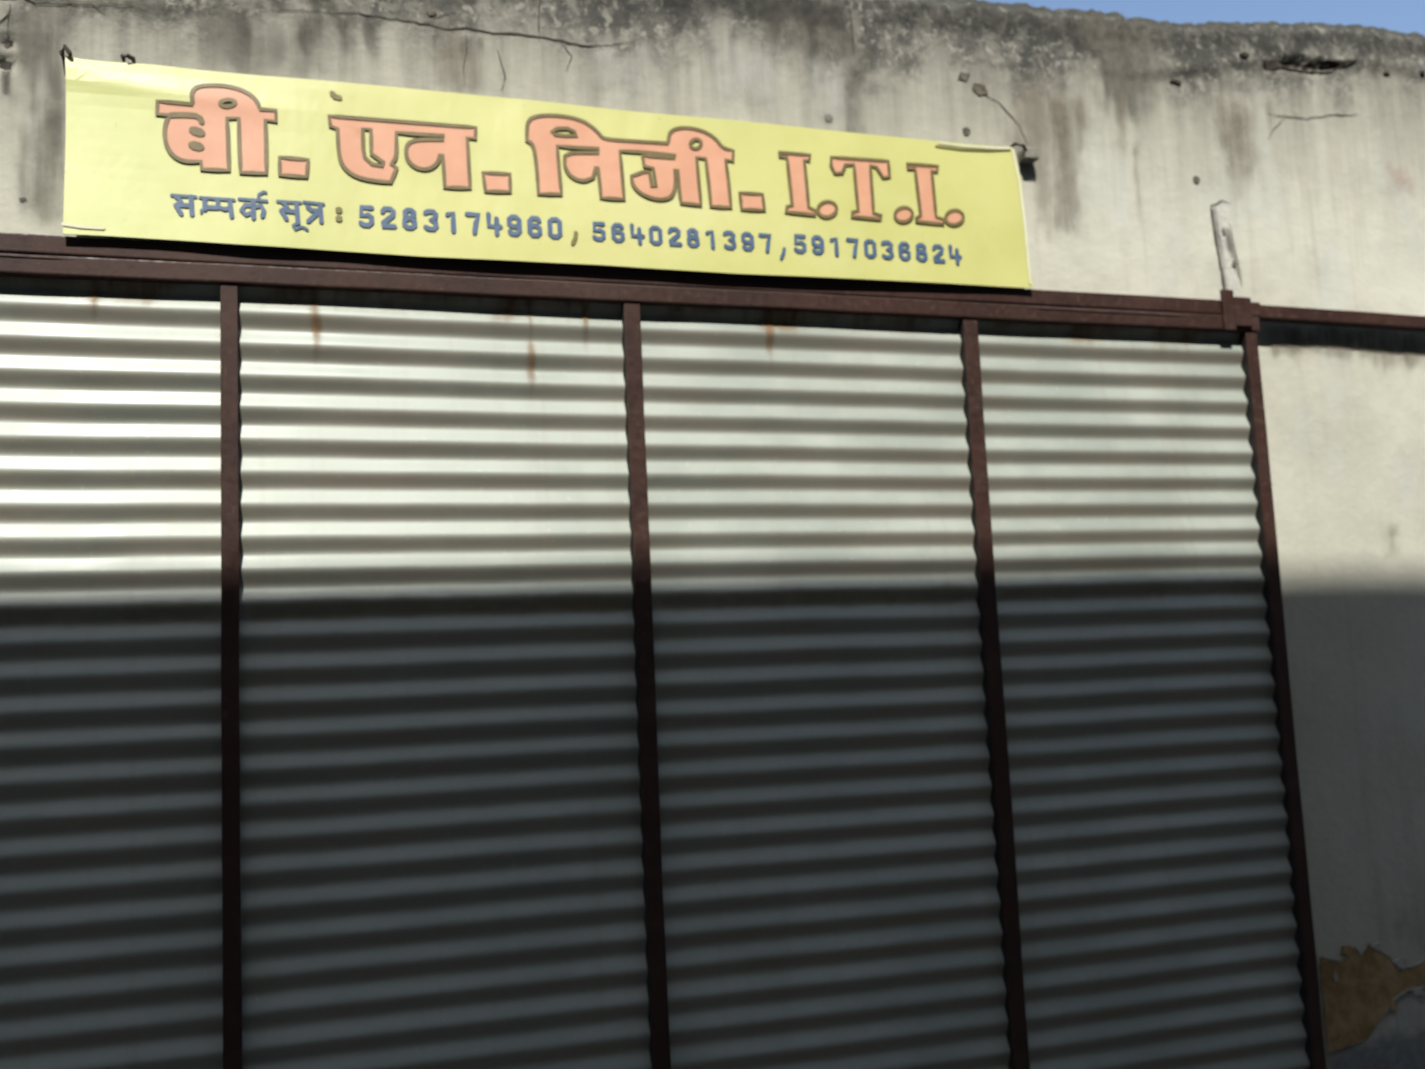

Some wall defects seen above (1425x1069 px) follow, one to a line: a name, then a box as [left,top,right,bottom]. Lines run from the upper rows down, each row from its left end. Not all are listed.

crack [7,0,133,38]
crack [272,0,633,89]
peeling [1320,942,1425,1052]